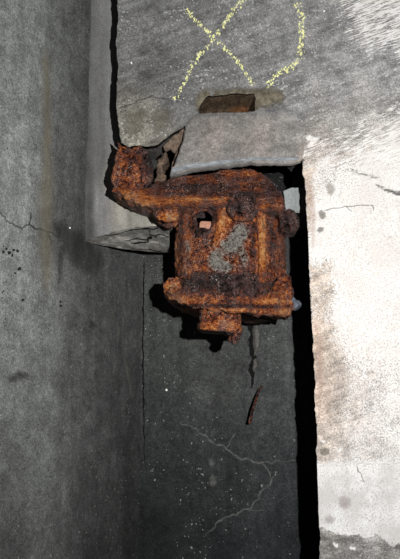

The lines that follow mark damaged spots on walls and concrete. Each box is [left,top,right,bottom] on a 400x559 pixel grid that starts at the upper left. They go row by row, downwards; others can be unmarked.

spalling [163,129,184,177]
crack [1,212,58,245]
crack [139,262,147,461]
crack [247,324,261,388]
crack [181,424,294,537]